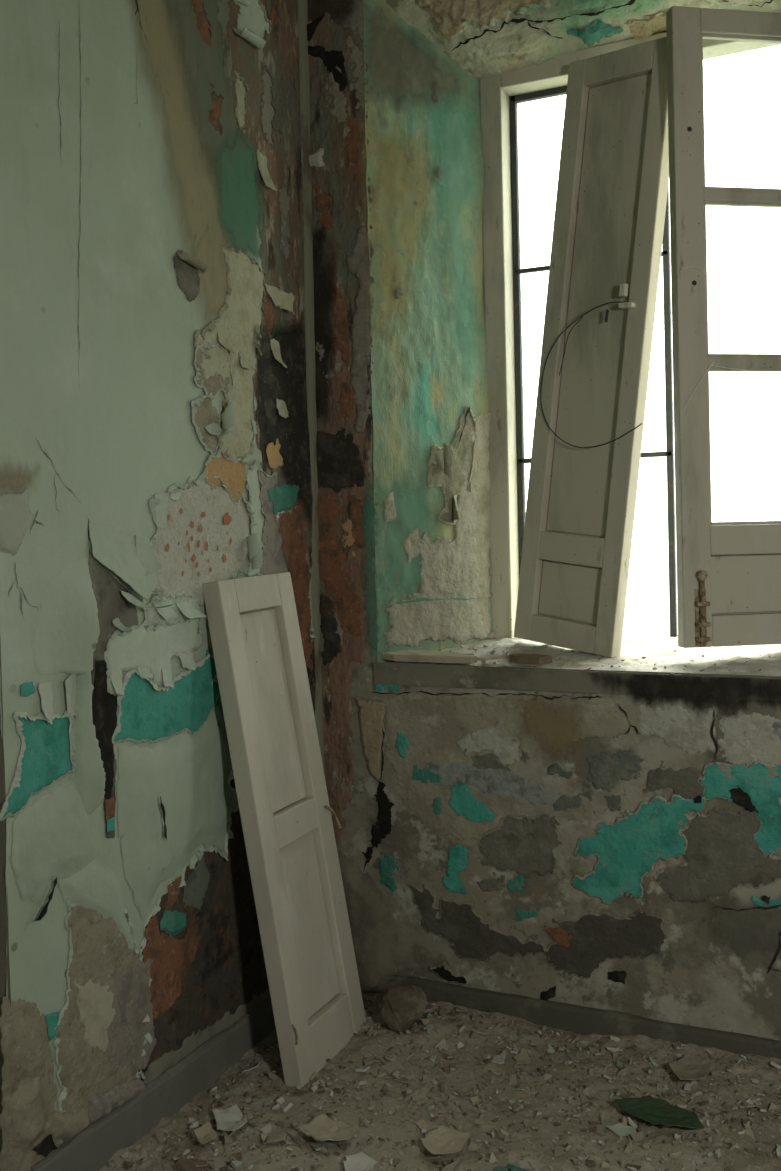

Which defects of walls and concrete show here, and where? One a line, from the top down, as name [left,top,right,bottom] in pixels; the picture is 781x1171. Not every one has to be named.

spalling [415,0,551,45]
crack [451,0,635,51]
spalling [624,9,669,39]
damp [255,228,365,523]
peeling [0,0,397,844]
spalling [383,405,496,649]
spalling [477,815,562,892]
peeling [571,760,781,904]
spalling [0,768,270,1171]
spalling [540,986,556,1000]
spalling [608,971,626,984]
crack [713,905,781,973]